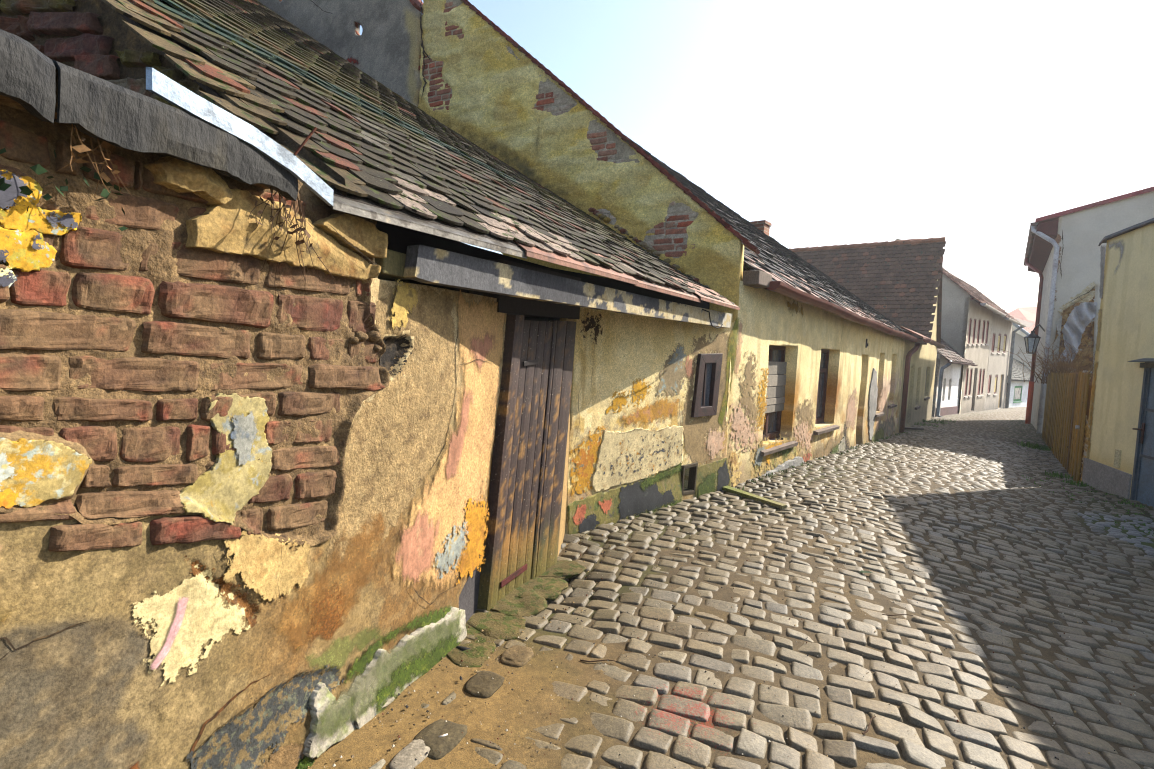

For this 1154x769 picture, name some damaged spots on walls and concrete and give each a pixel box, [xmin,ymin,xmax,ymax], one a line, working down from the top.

spalling [418,55,452,112]
spalling [532,75,577,116]
spalling [587,119,640,163]
spalling [643,201,699,258]
spalling [0,104,506,769]
flaking render [567,332,814,535]